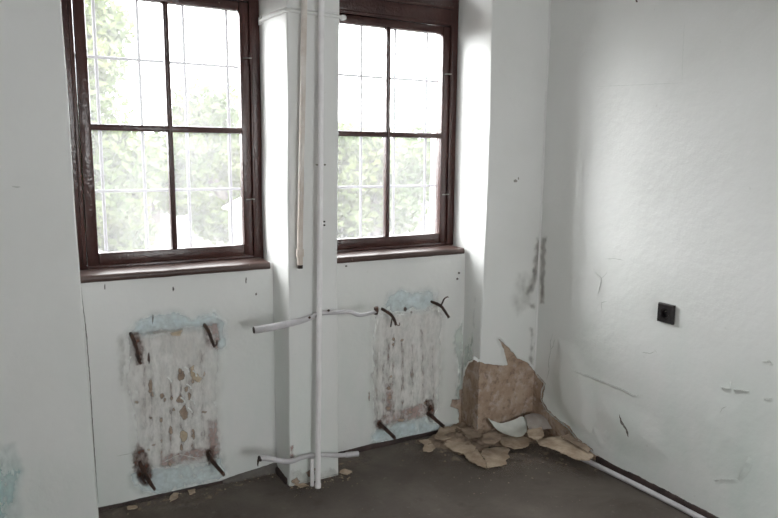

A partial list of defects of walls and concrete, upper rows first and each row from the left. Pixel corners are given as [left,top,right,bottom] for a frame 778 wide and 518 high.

peeling [129,324,219,468]
peeling [369,309,440,424]
peeling [451,337,599,468]
crack [570,368,644,399]
corrosion [133,446,152,485]